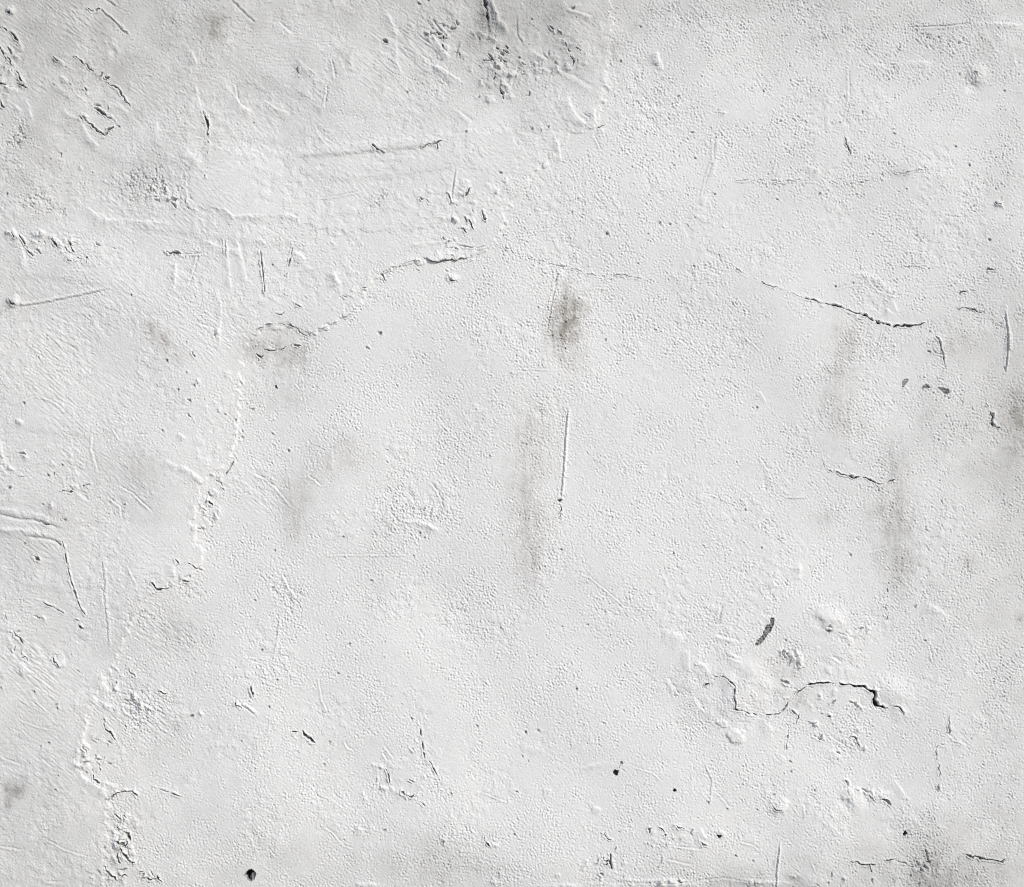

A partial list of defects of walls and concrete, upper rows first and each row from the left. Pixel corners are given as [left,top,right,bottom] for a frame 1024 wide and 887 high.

crack [703,242,948,372]
crack [818,460,901,489]
crack [701,674,907,755]